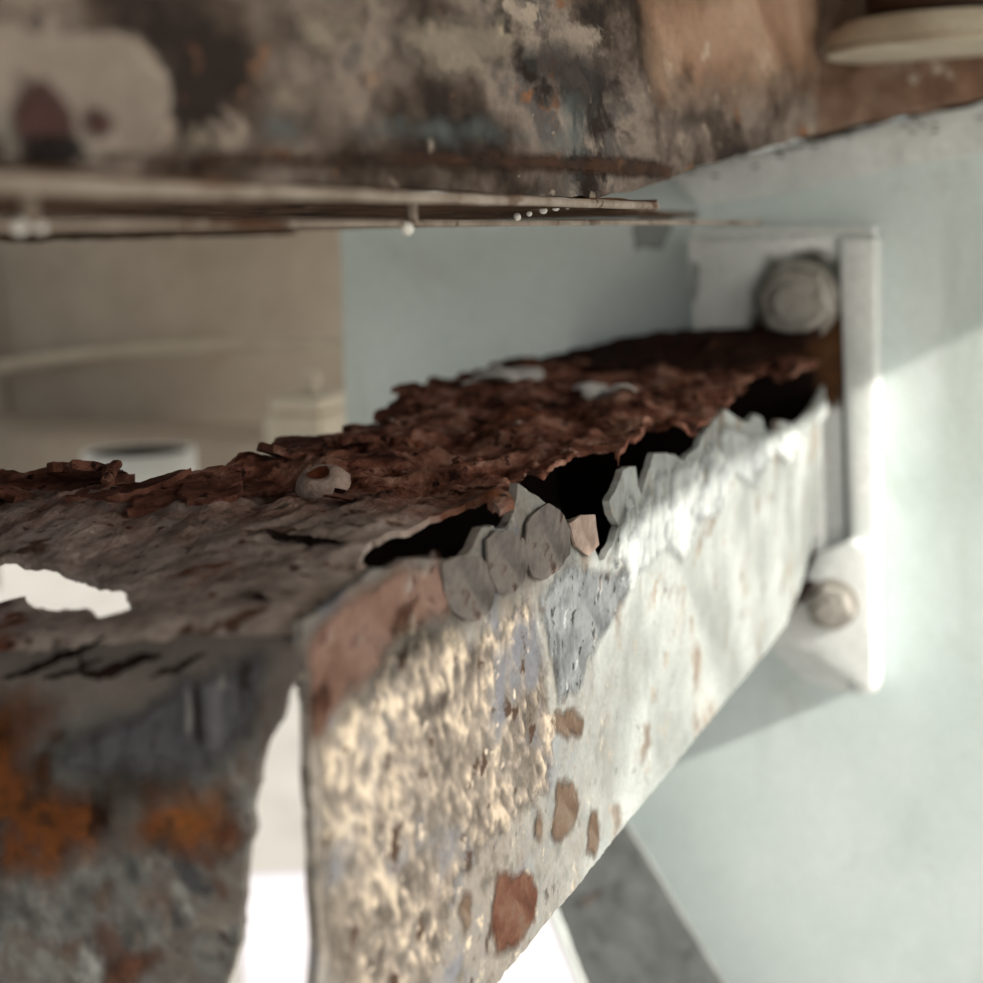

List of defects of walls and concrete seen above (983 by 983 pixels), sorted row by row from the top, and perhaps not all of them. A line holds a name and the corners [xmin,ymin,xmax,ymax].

corrosion [794,314,845,407]
corrosion [256,376,472,460]
corrosion [0,459,276,518]
peeling [540,400,828,702]
corrosion [554,708,584,739]
corrosion [0,700,241,874]
corrosion [536,781,579,843]
corrosion [587,811,599,857]
corrosion [492,870,538,953]